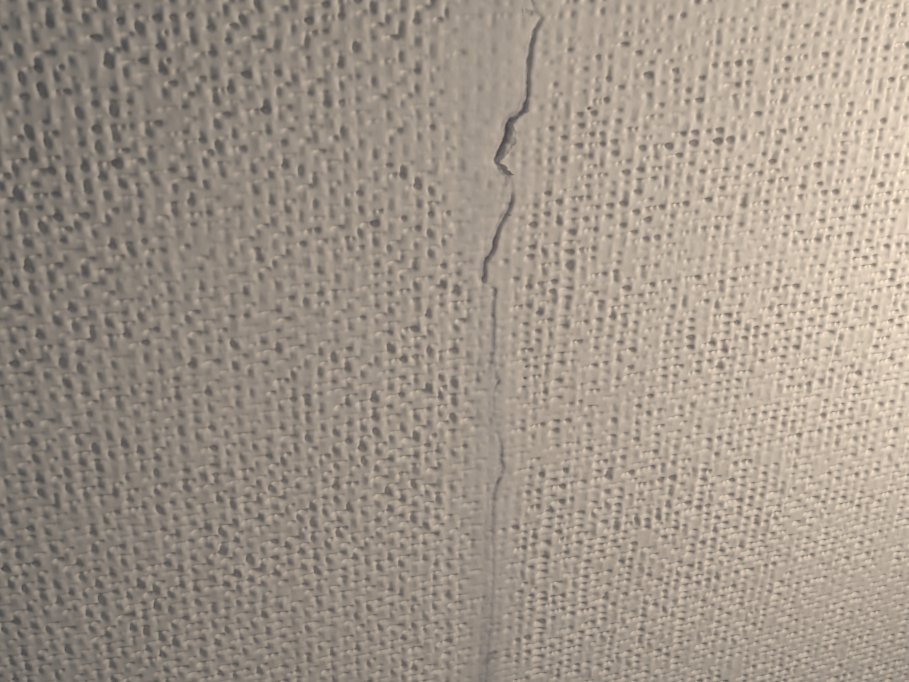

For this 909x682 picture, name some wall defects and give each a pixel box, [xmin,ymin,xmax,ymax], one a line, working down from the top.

crack [494,20,540,162]
crack [482,196,512,295]